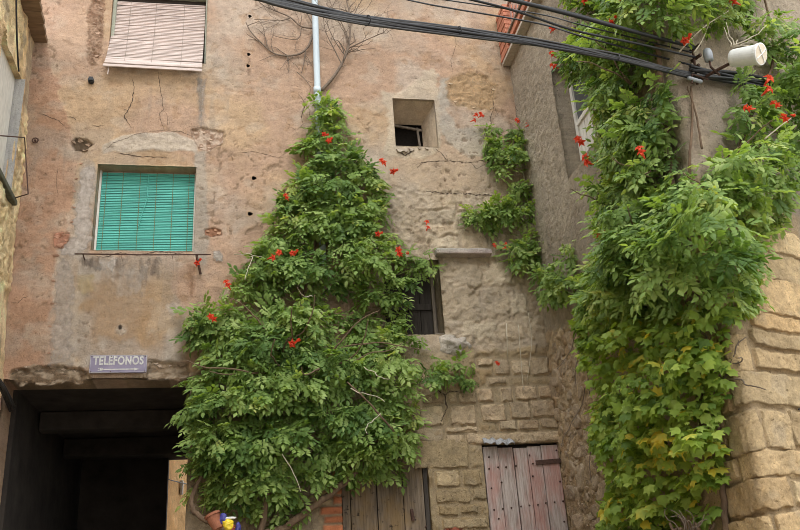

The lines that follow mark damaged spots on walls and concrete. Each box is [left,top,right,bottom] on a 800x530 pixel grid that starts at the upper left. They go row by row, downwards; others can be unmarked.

crack [101,72,195,158]
flaking render [71,138,91,152]
flaking render [190,128,223,151]
flaking render [147,358,189,381]